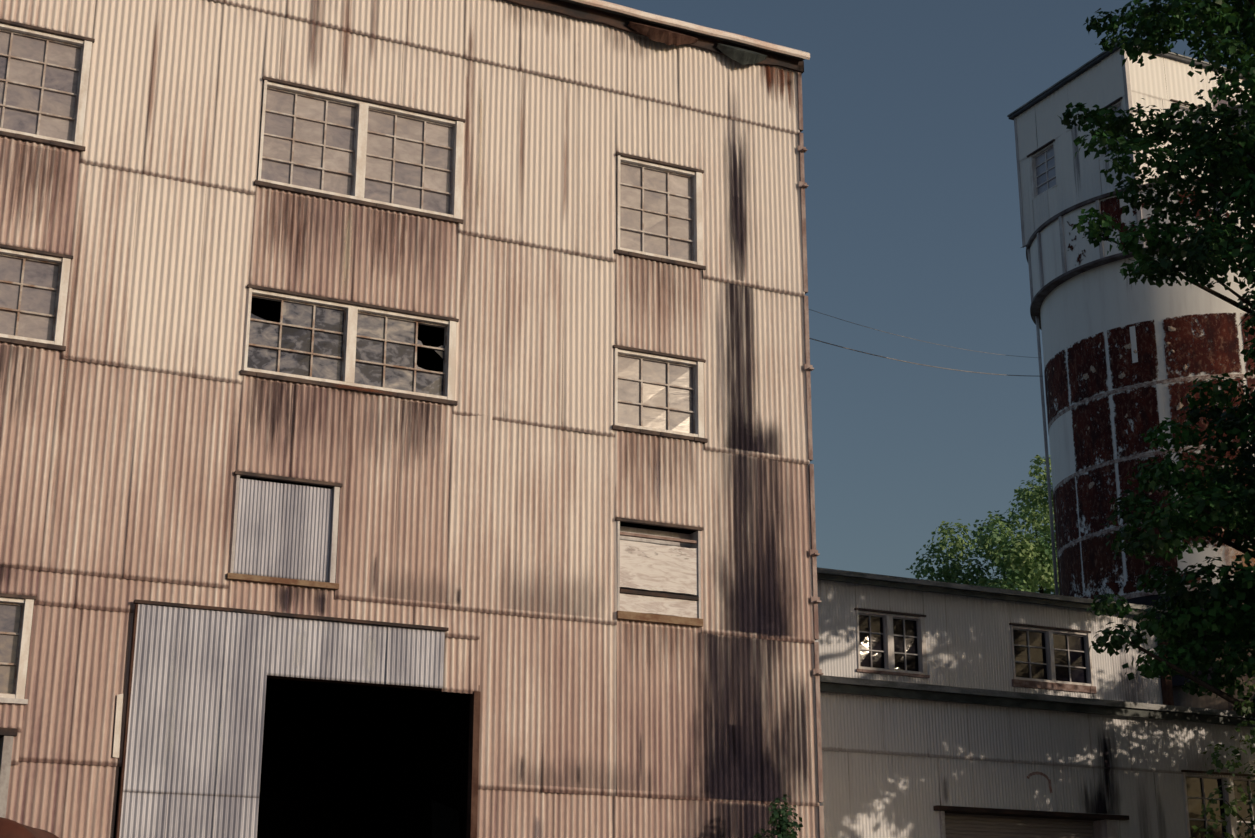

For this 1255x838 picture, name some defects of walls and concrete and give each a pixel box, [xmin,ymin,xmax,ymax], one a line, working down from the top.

rust [766,66,794,103]
leakage [704,137,808,838]
rust [1044,313,1255,599]
leakage [1085,734,1114,814]